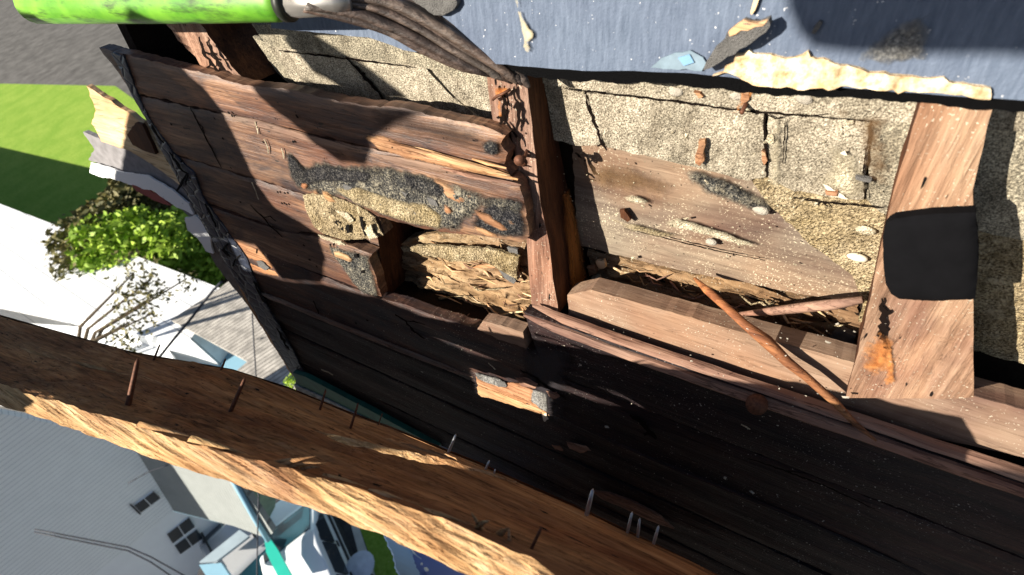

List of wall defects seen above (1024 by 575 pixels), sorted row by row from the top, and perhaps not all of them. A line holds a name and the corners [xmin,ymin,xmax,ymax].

peeling [651,48,992,100]
crack [565,88,883,208]
peeling [427,179,463,213]
spalling [301,184,384,274]
peeling [476,212,505,236]
corrosion [870,344,892,381]
peeling [475,373,560,422]